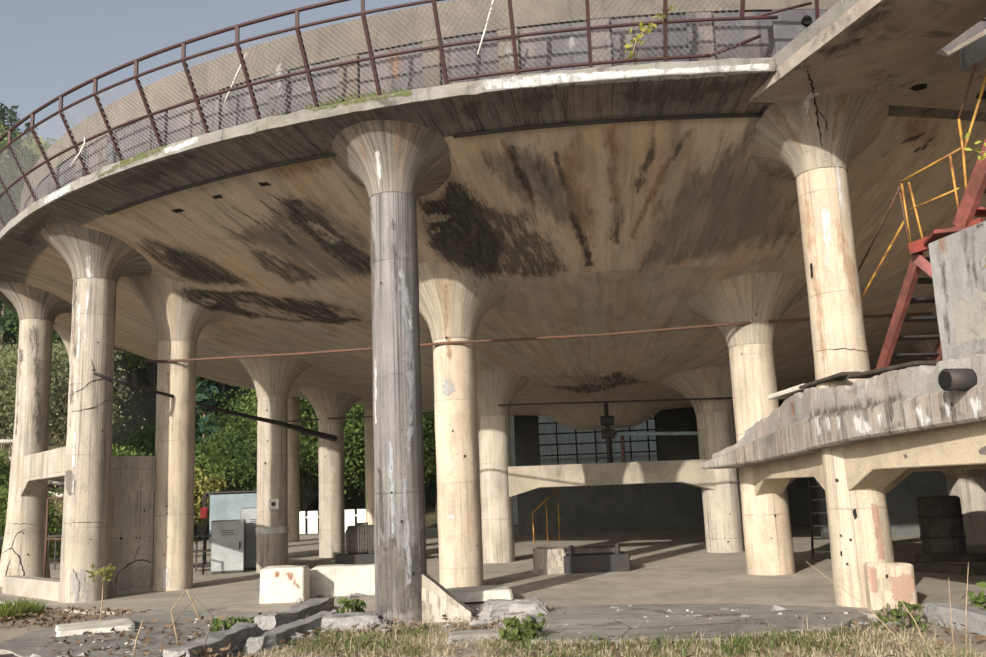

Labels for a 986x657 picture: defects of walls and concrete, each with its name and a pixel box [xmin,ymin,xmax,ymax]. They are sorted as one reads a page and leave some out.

crack [807,70,828,146]
leakage [631,140,655,193]
leakage [141,198,375,325]
leakage [419,183,566,282]
leakage [485,147,593,266]
crack [72,359,114,412]
crack [3,523,33,576]